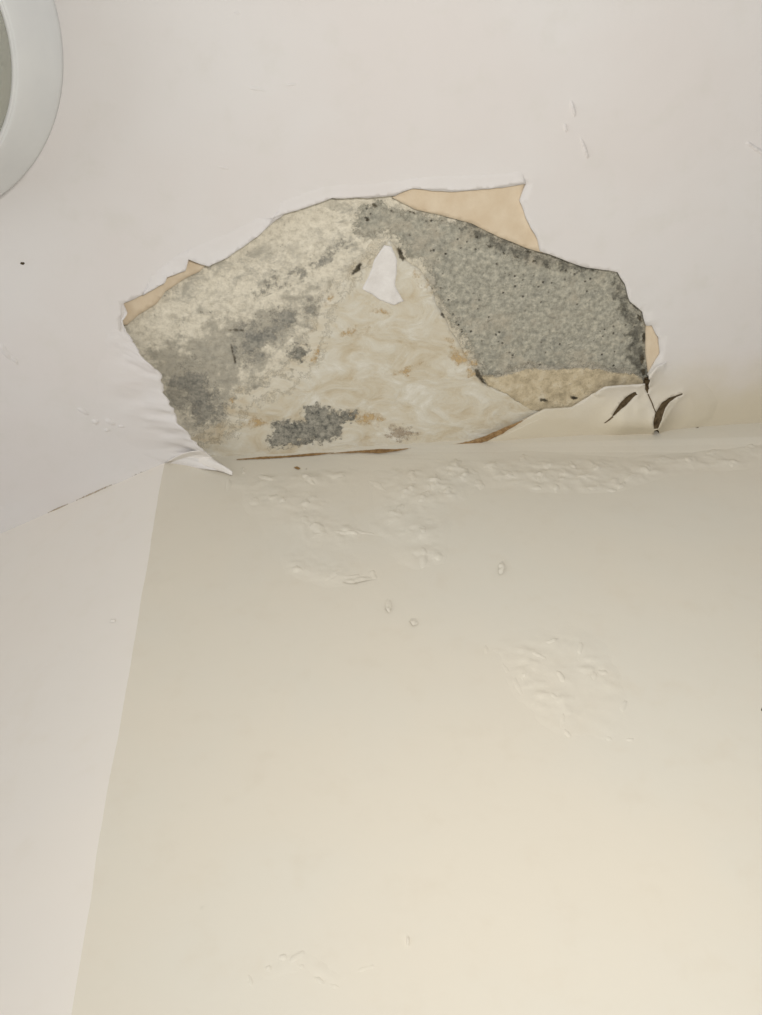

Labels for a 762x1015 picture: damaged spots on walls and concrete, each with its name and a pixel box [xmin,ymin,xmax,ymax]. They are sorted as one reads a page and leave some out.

spalling [123,172,659,457]